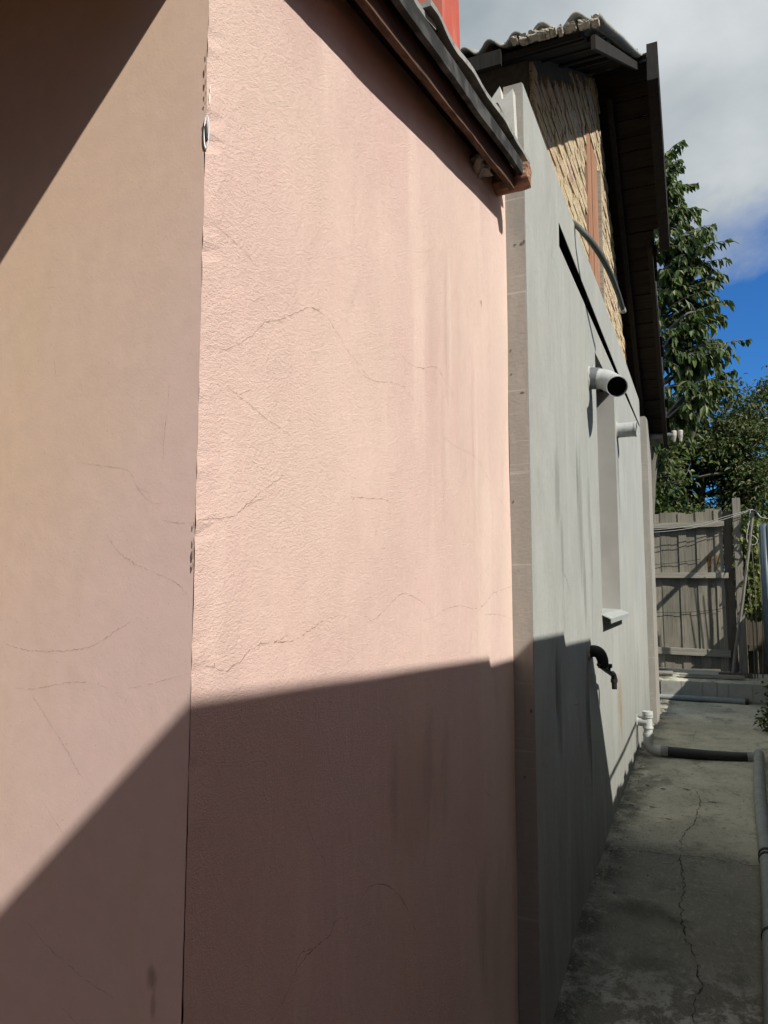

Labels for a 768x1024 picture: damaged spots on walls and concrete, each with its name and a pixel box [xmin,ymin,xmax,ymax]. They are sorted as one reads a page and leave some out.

crack [610,768,760,1021]